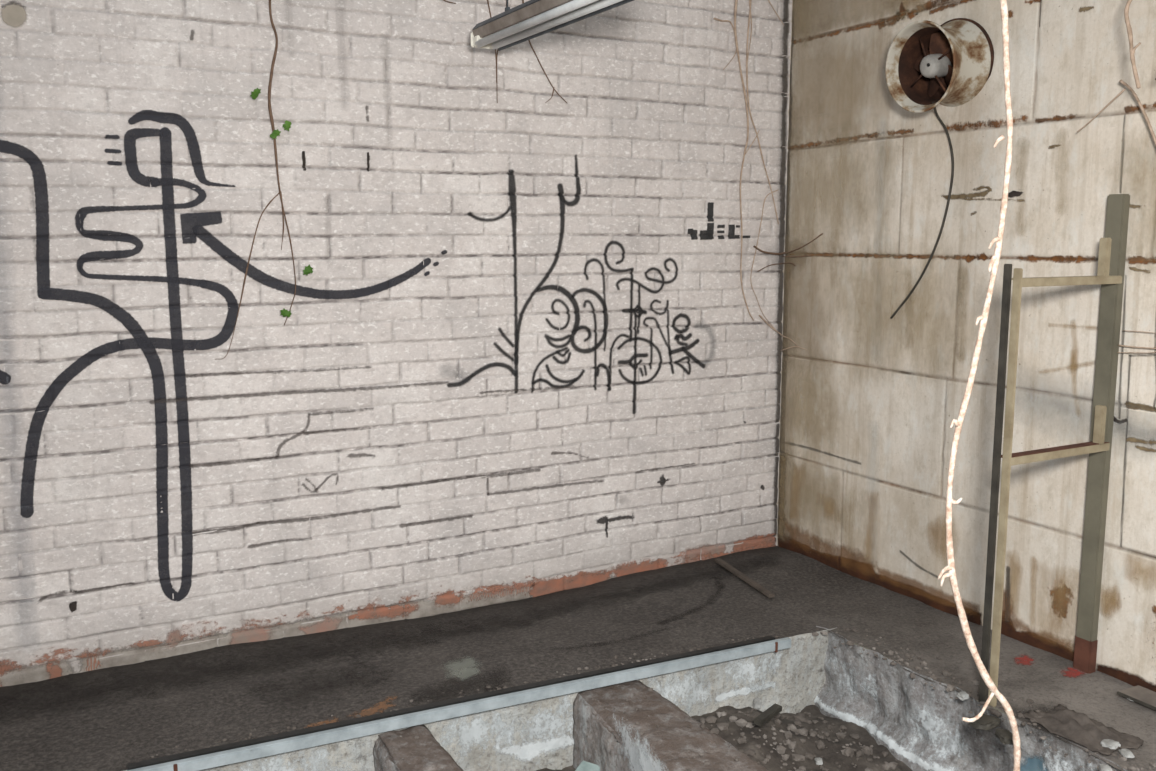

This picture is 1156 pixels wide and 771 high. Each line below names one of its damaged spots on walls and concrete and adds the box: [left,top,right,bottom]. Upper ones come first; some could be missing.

rust [793,0,972,44]
rust [1124,102,1156,113]
rust [946,114,1075,131]
rust [788,129,914,149]
rust [786,252,992,263]
rust [1019,255,1095,263]
rust [1128,256,1156,264]
peeling [0,534,776,687]
rust [1001,566,1074,661]
rust [1096,665,1156,692]